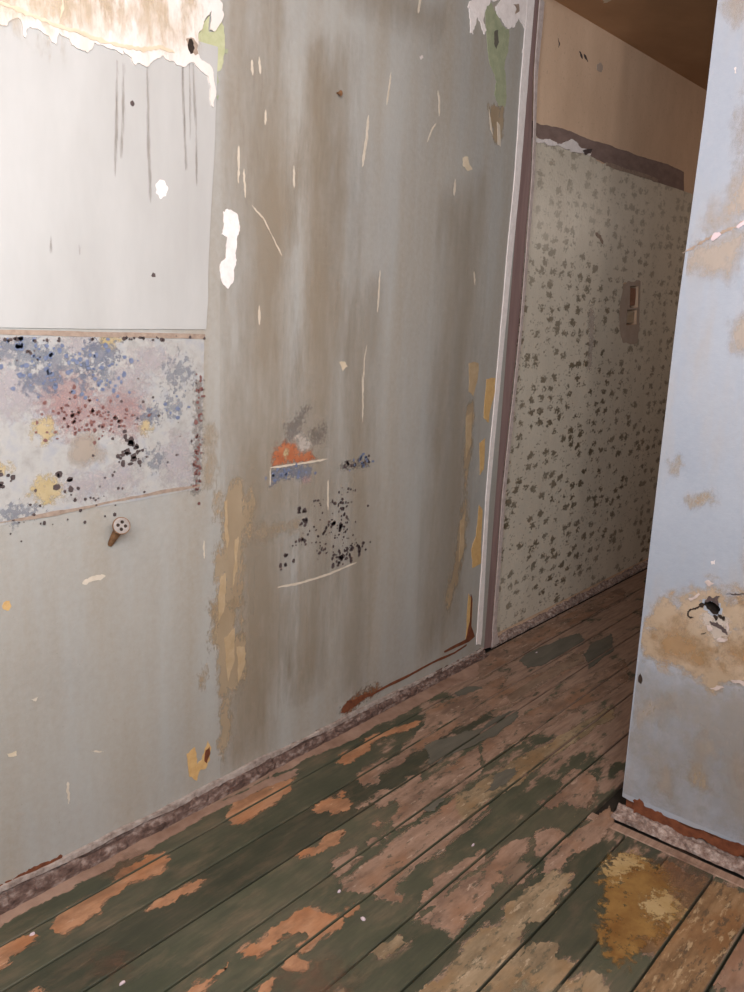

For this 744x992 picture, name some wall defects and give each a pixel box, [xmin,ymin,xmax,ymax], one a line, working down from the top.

peeling [0,0,228,107]
peeling [467,0,527,107]
peeling [219,209,240,289]
peeling [445,362,495,610]
peeling [187,457,298,781]
spalling [704,601,729,642]